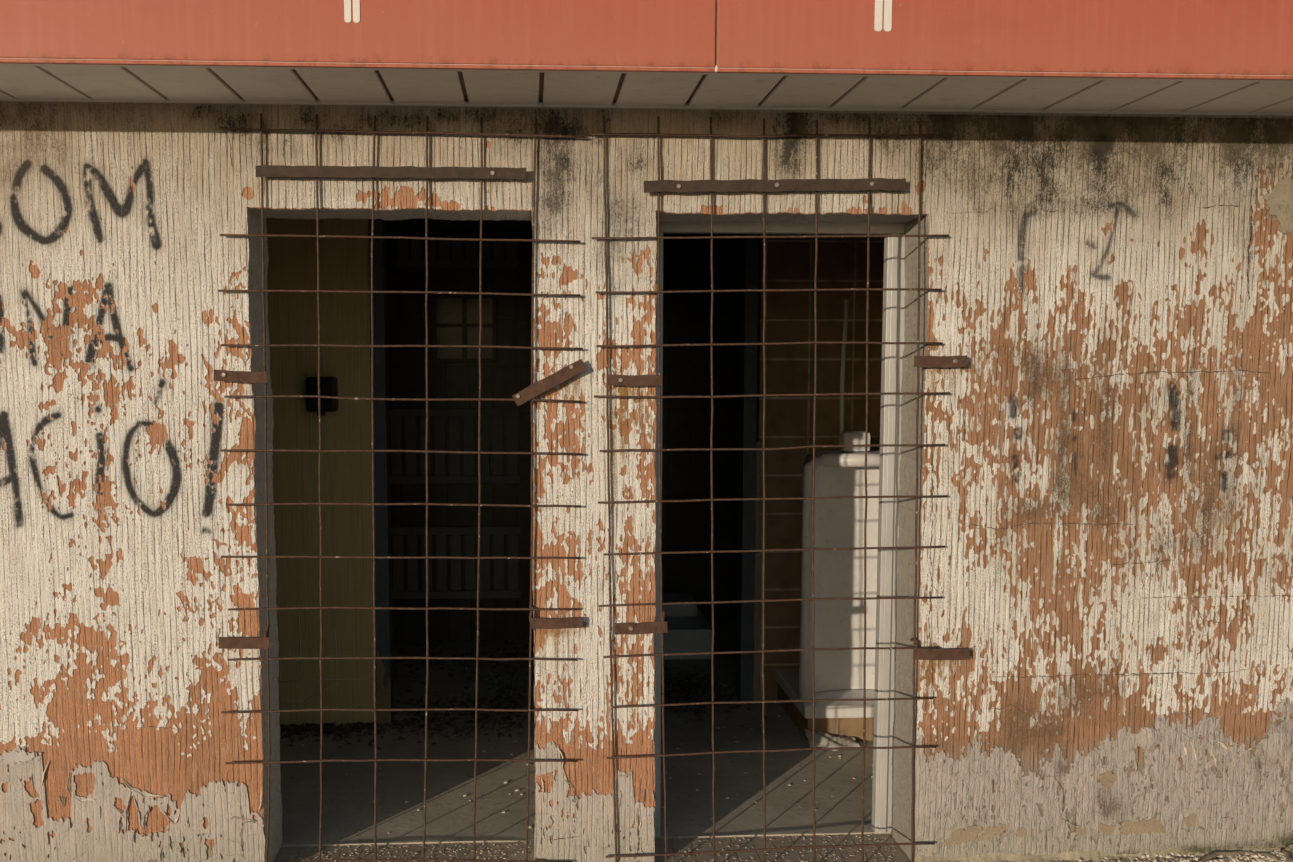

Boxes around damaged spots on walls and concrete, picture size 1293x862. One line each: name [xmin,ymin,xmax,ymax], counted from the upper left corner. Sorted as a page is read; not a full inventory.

peeling [242,187,304,223]
peeling [356,186,514,211]
water stain [295,107,610,214]
water stain [712,112,1293,216]
corrosion [610,386,642,462]
peeling [0,259,265,862]
peeling [533,244,657,862]
peeling [916,162,1293,855]